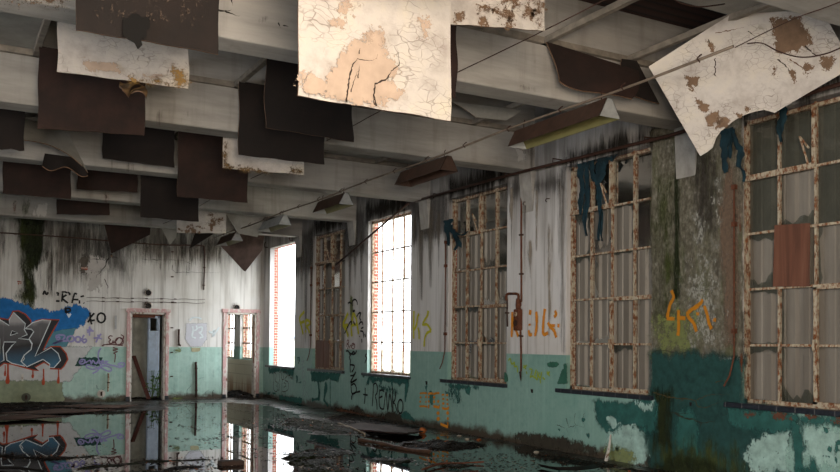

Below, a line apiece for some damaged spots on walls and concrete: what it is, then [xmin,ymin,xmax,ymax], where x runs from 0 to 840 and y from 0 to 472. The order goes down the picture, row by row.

peeling [293,24,406,109]
crack [345,50,400,106]
peeling [476,0,548,32]
peeling [769,15,813,54]
crack [777,45,823,71]
peeling [788,55,837,84]
leakage [13,201,124,290]
leakage [594,118,840,472]
peeling [635,400,654,412]
peeling [604,415,651,466]
peeling [743,411,840,472]